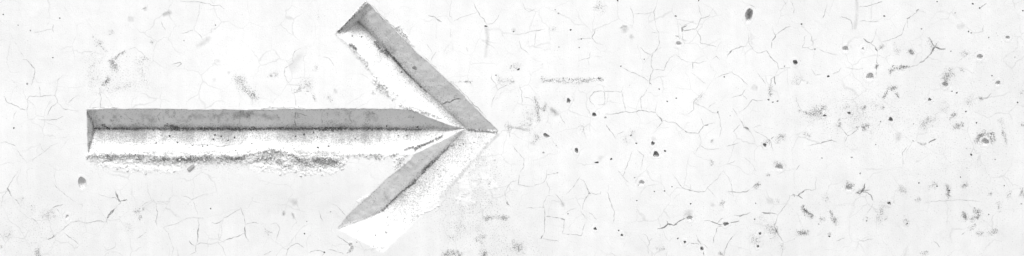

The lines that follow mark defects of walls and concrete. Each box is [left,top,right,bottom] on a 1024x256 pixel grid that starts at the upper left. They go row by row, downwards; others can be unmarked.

crack [2,28,349,256]
crack [501,0,923,255]
crack [907,39,945,68]